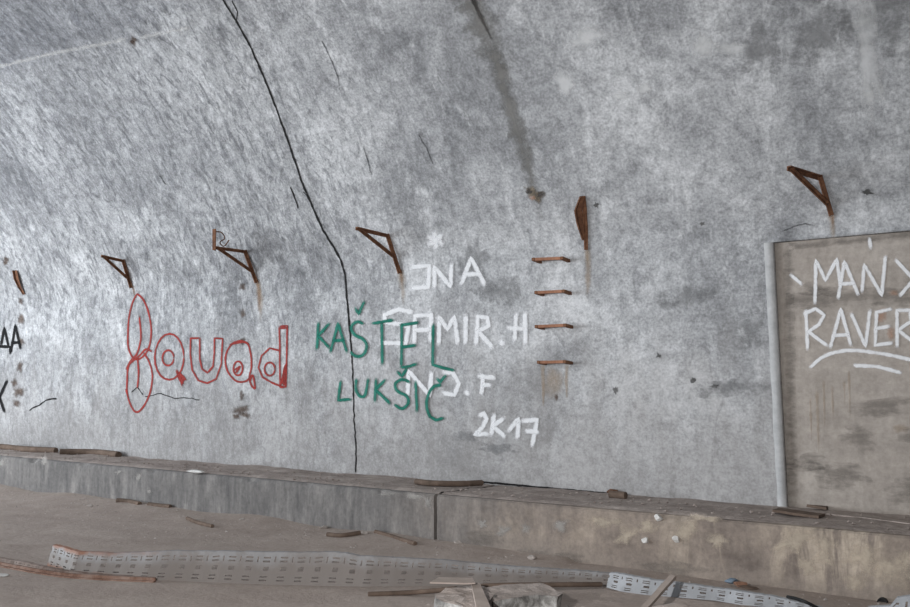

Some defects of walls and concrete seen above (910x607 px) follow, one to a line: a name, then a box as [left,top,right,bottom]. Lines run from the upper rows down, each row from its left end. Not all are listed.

crack [222,0,357,472]
damp [460,0,533,183]